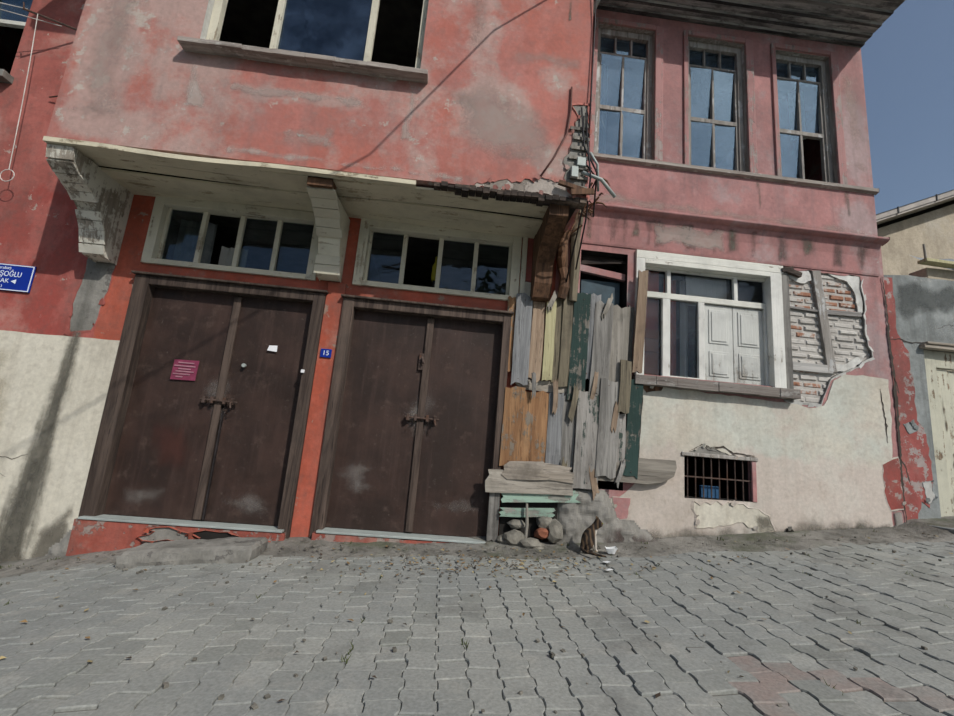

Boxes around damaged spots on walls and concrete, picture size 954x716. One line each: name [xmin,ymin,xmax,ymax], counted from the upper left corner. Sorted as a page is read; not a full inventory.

spalling [472,102,624,201]
peeling [64,256,120,336]
peeling [789,271,811,284]
spalling [785,274,875,407]
water stain [0,332,80,563]
spalling [903,419,919,434]
spalling [922,480,938,505]